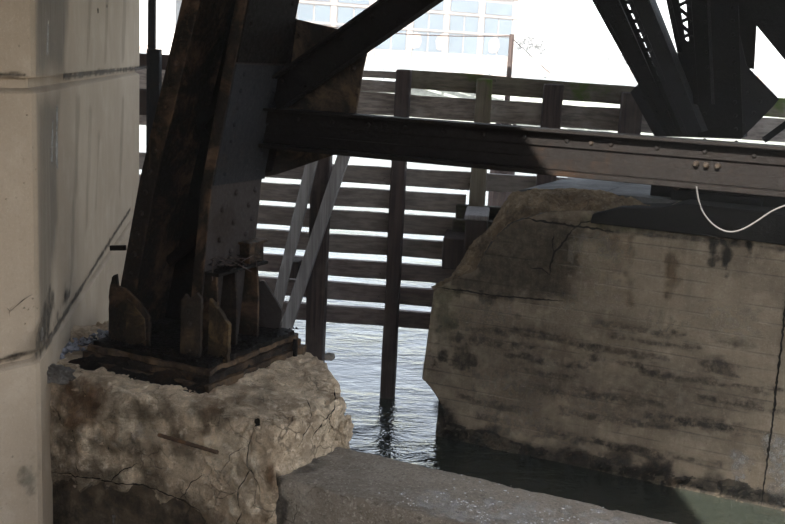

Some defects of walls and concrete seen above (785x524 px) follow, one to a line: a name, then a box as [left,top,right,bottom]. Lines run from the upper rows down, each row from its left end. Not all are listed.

spalling [431,188,650,291]
crack [525,218,614,276]
leakage [637,232,752,267]
crack [437,287,558,301]
crack [298,383,336,447]
leakage [434,401,526,447]
crack [762,308,785,491]
crack [53,463,206,522]
crack [216,423,260,524]
leakage [510,427,785,511]